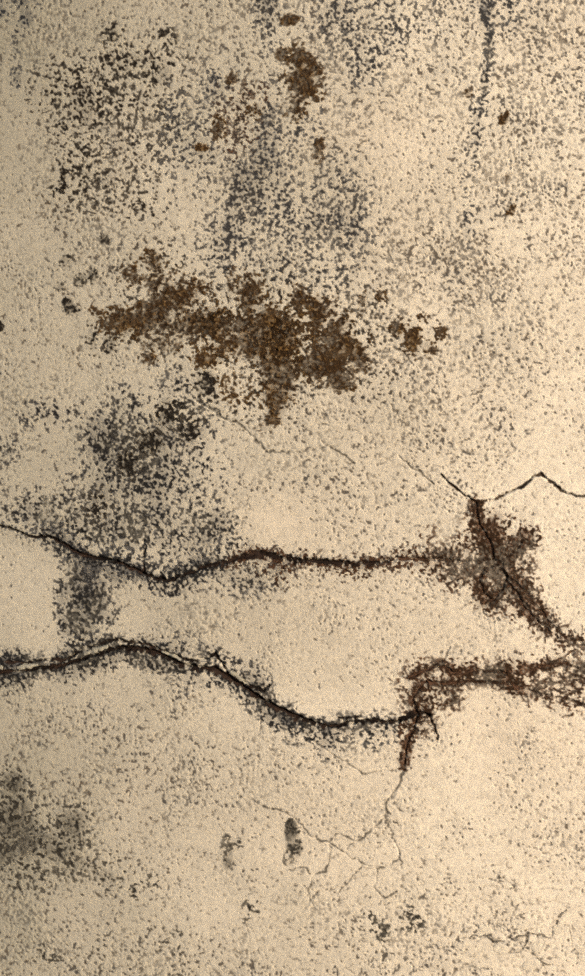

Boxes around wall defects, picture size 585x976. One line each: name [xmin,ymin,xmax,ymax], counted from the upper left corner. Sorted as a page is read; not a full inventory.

rust [195,70,267,153]
crack [0,467,585,891]